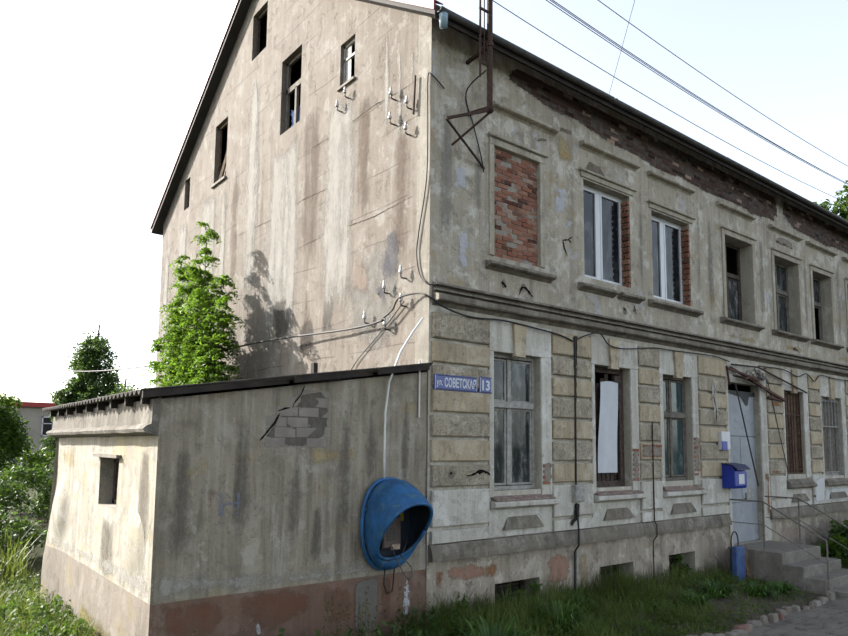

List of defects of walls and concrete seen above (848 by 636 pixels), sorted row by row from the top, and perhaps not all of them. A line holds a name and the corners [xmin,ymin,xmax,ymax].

leakage [160,227,187,359]
leakage [199,191,226,298]
leakage [243,83,259,293]
leakage [266,142,298,337]
leakage [321,102,354,313]
flaking render [507,65,848,255]
flaking render [265,389,330,448]
leakage [50,523,143,591]
leakage [138,455,148,534]
leakage [174,455,188,548]